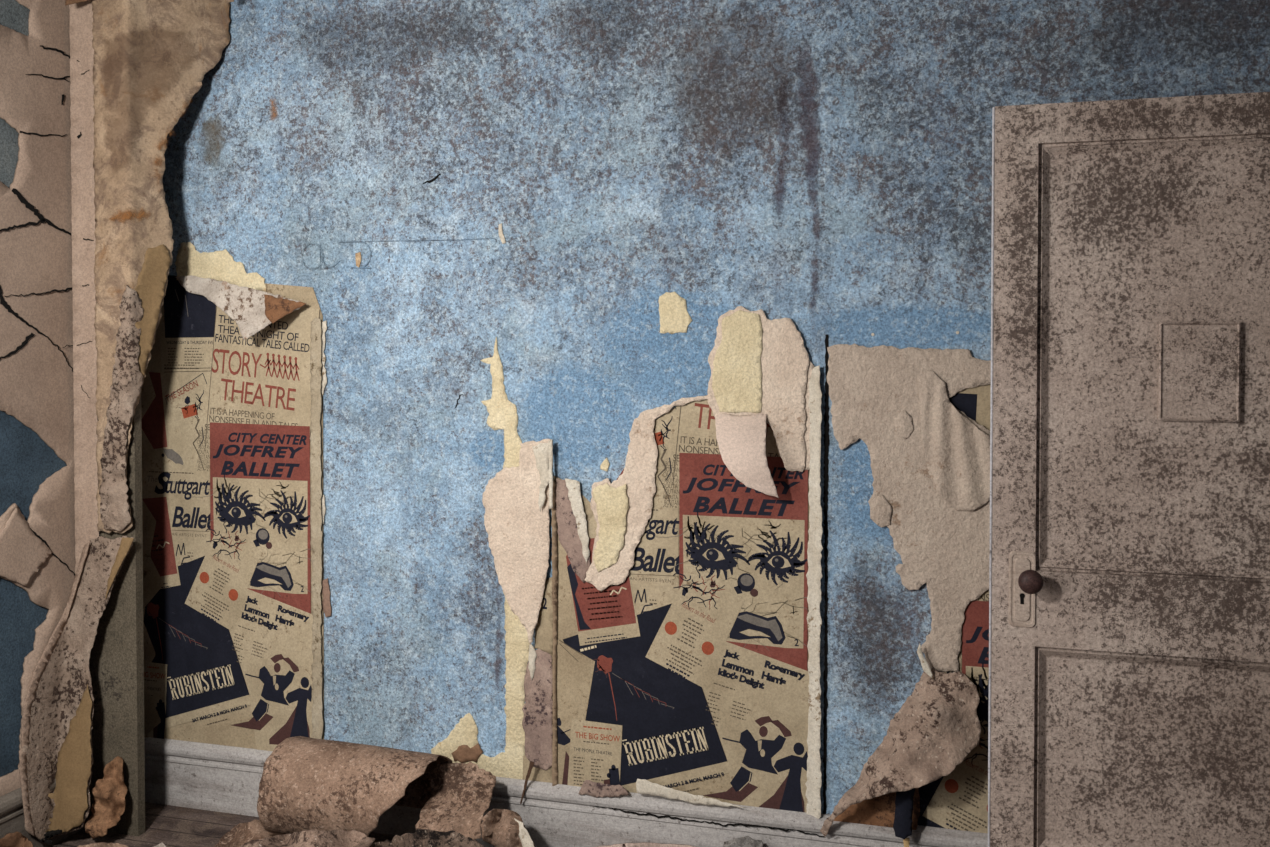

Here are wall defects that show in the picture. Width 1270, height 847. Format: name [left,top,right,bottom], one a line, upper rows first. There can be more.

crack [20,45,89,139]
water stain [774,40,819,238]
crack [0,188,94,241]
crack [0,284,98,420]
spalling [99,285,144,531]
peeling [533,443,549,512]
spalling [0,411,67,777]